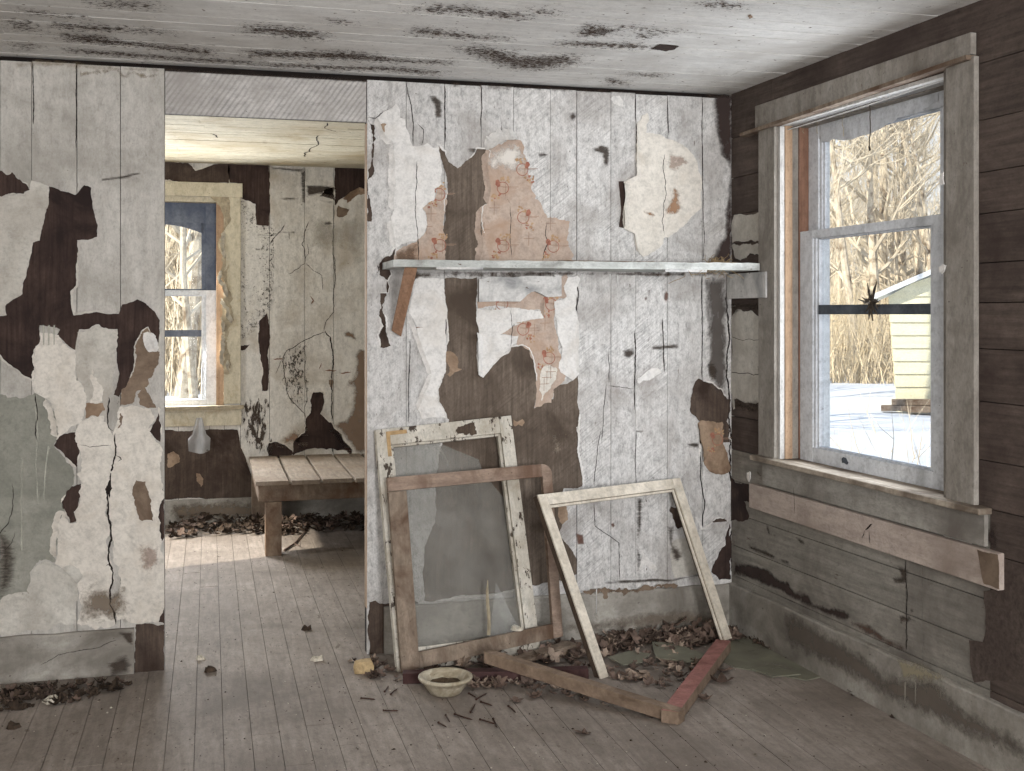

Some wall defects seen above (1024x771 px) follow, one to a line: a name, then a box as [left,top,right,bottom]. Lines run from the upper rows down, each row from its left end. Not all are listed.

peeling [0,171,29,197]
peeling [0,185,161,404]
crack [271,123,336,419]
peeling [377,247,398,348]
peeling [437,144,491,260]
peeling [731,213,758,261]
peeling [54,432,80,467]
peeling [267,390,352,458]
peeling [688,309,758,580]
peeling [61,483,82,523]
crack [43,398,122,664]